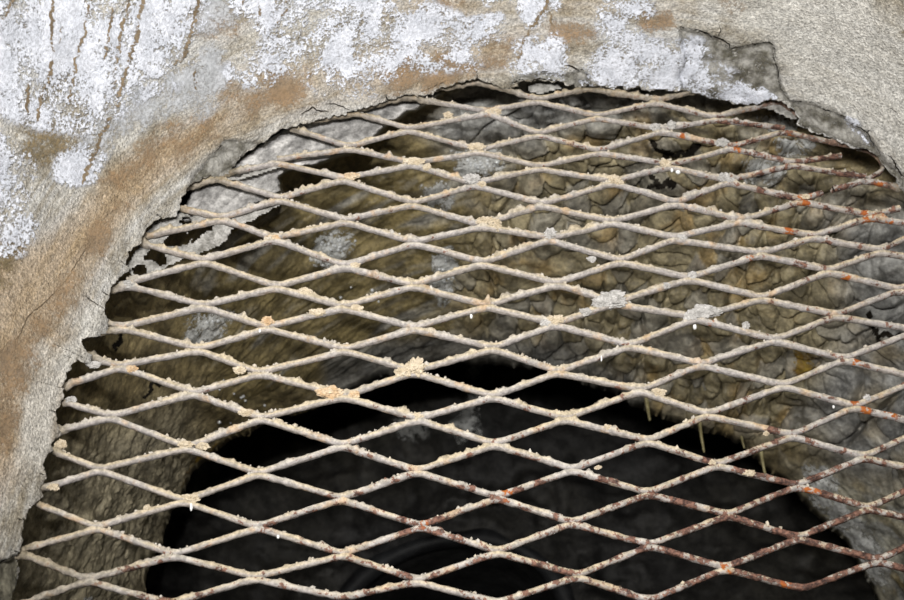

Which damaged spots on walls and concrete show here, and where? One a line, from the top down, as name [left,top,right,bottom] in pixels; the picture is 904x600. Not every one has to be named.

leakage [0,0,568,289]
spalling [510,69,592,94]
leakage [607,174,624,185]
leakage [649,120,676,131]
leakage [578,0,778,105]
leakage [717,113,816,187]
spalling [679,27,904,189]
peeling [127,205,280,275]
leakage [429,246,459,308]
spalling [0,557,18,600]